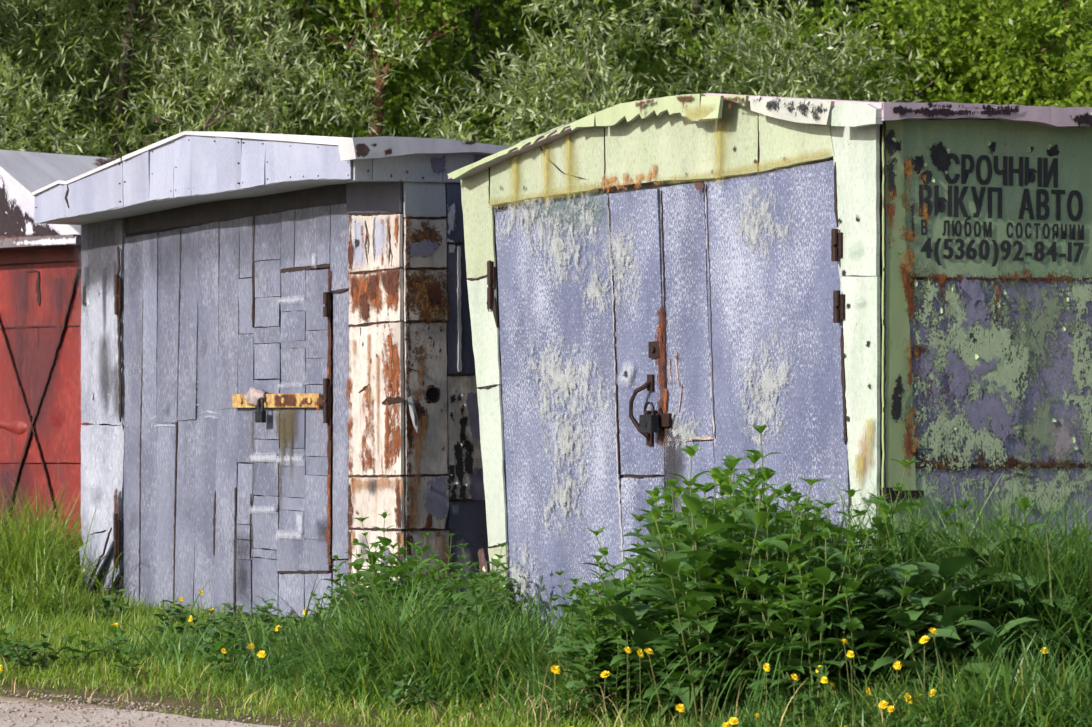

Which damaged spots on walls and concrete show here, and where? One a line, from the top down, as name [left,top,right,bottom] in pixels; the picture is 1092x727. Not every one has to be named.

peeling [754,95,821,121]
peeling [893,103,1020,118]
peeling [1070,112,1092,126]
peeling [0,176,76,247]
corrosion [598,165,658,193]
corrosion [885,157,1092,322]
corrosion [274,268,332,565]
corrosion [346,214,451,573]
peeling [424,390,485,520]
corrosion [657,426,668,445]
corrosion [655,305,678,413]
peeling [891,263,1092,546]